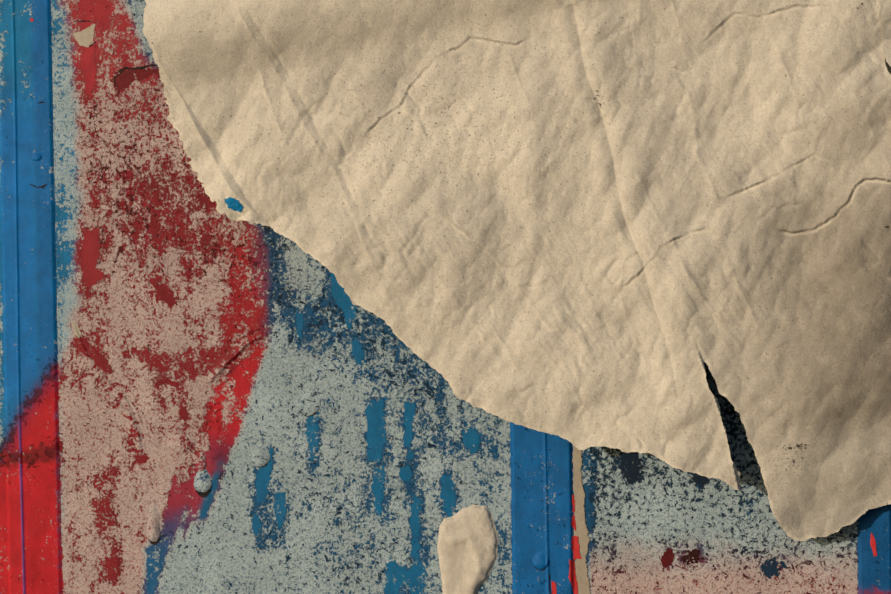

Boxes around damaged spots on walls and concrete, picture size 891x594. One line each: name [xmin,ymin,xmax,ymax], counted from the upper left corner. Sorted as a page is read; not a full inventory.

peeling [134,151,214,253]
peeling [153,280,179,308]
peeling [329,271,365,365]
peeling [252,448,287,536]
peeling [302,413,320,463]
peeling [365,396,387,516]
peeling [399,402,416,482]
peeling [440,474,456,517]
peeling [462,427,482,454]
peeling [619,452,646,486]
peeling [691,473,709,489]
peeling [383,493,428,594]